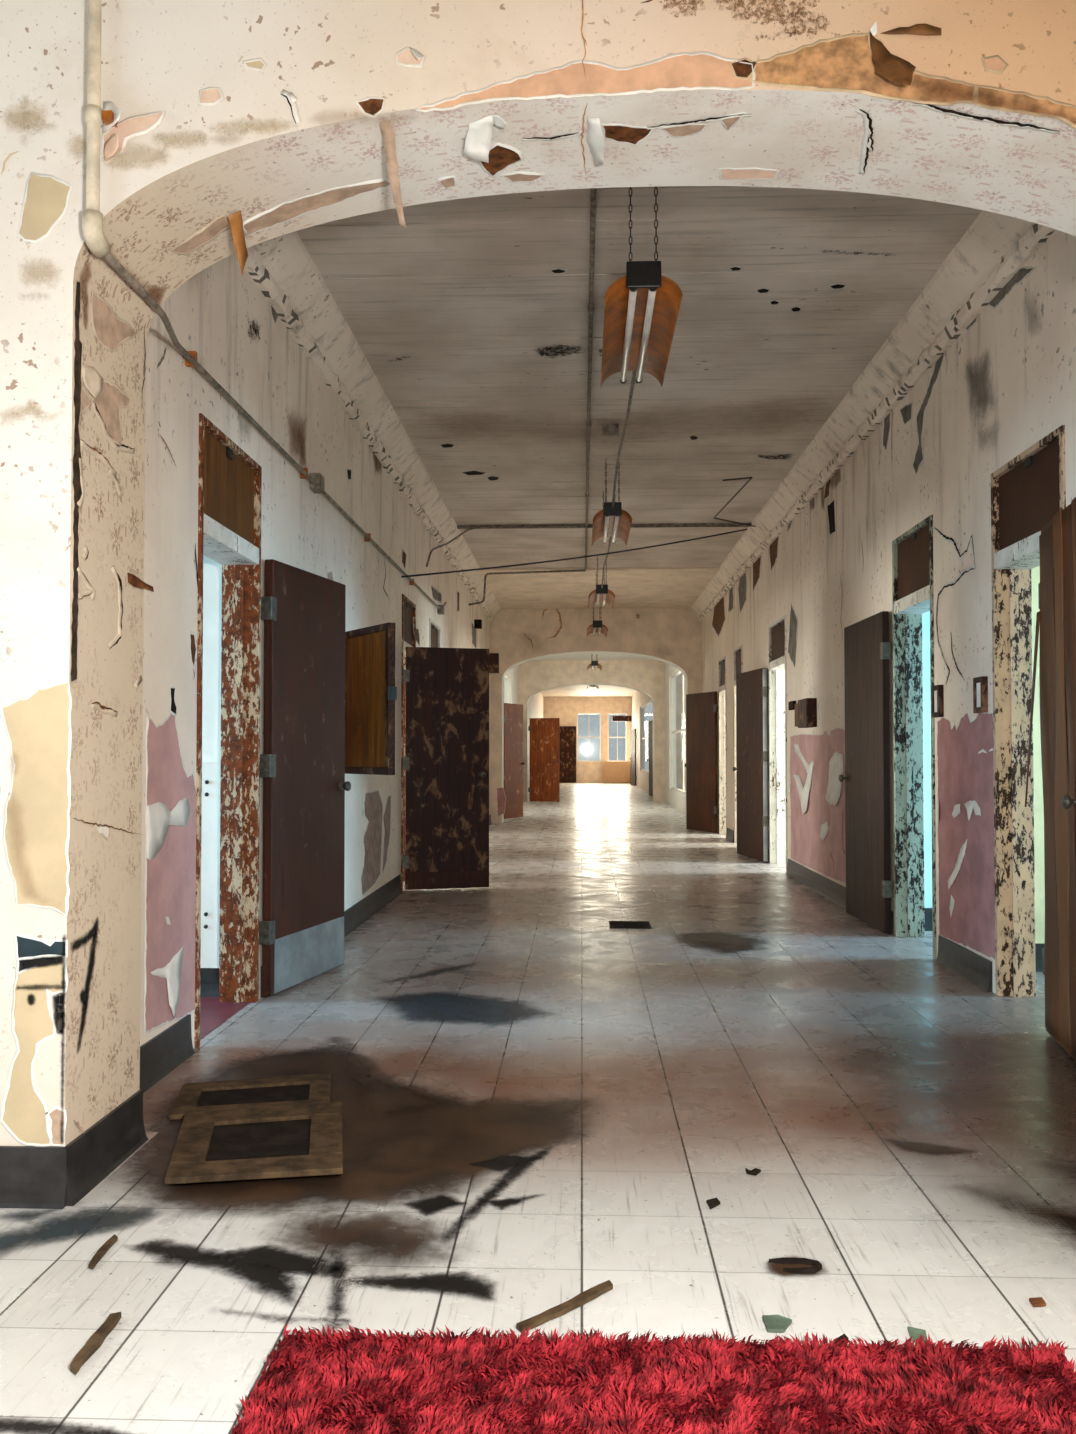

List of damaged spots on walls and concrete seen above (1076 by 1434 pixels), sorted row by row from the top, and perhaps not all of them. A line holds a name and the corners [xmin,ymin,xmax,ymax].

peeling [17,172,72,243]
peeling [101,101,166,166]
crack [522,0,588,173]
leakage [660,0,827,39]
peeling [415,21,1076,183]
crack [855,109,874,175]
crack [913,103,1060,134]
peeling [1,681,72,917]
peeling [144,686,198,1033]
peeling [790,727,846,884]
peeling [937,712,995,960]
peeling [0,934,68,1147]